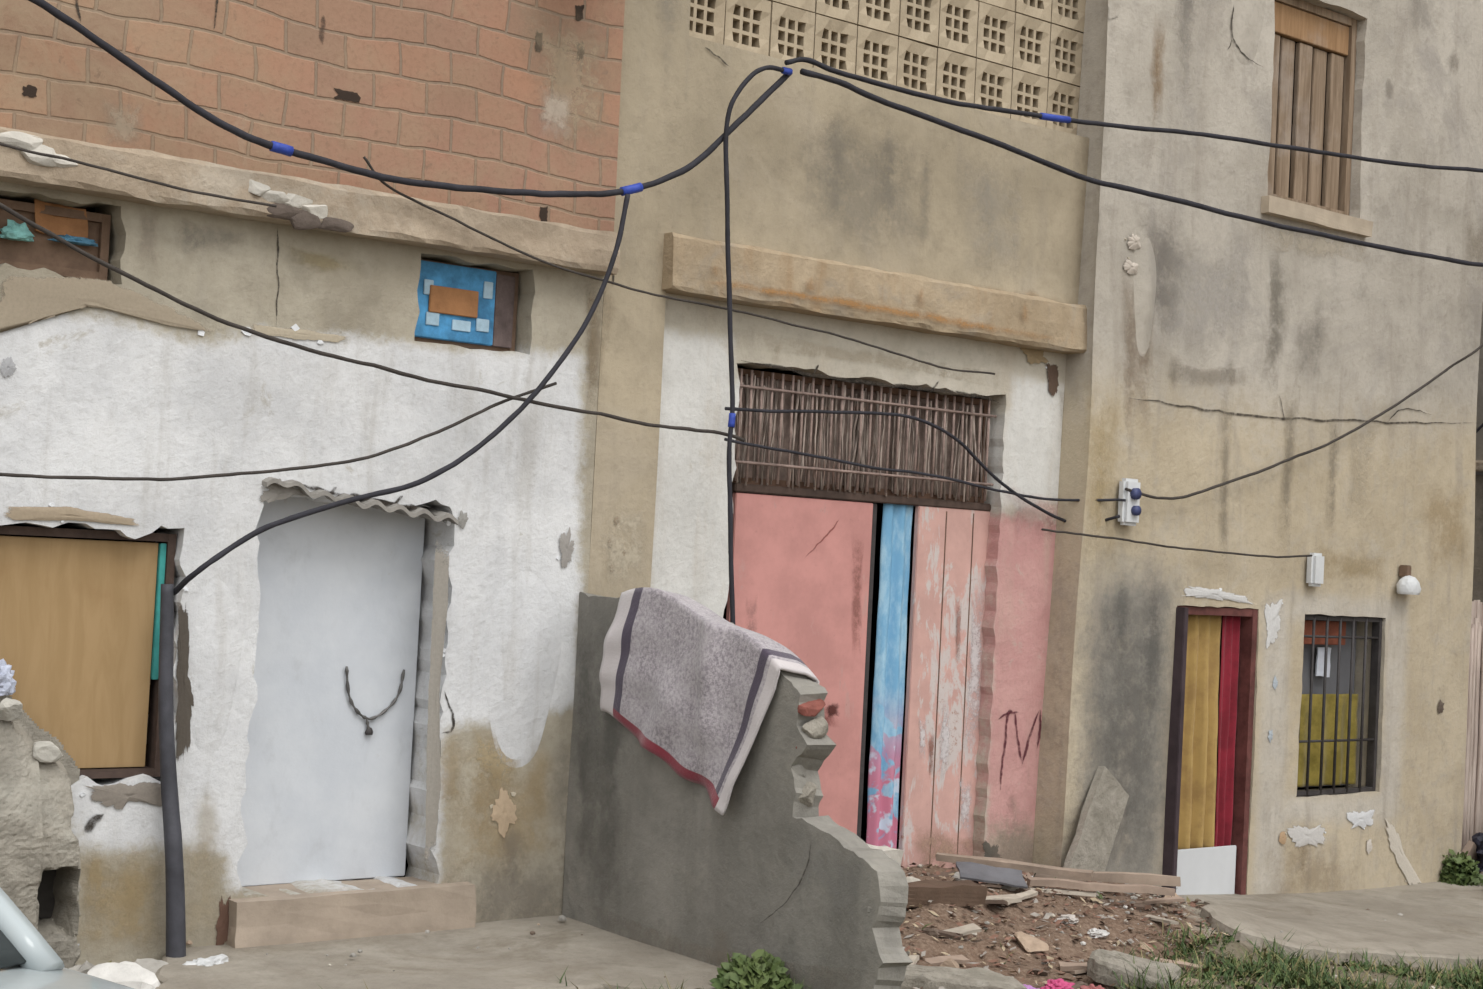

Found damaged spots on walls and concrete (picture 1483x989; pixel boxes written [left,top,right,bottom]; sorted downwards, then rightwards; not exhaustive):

spalling [248,180,354,233]
peeling [0,276,209,336]
peeling [0,357,17,378]
peeling [5,503,138,526]
peeling [477,740,518,838]
spalling [1279,825,1326,848]